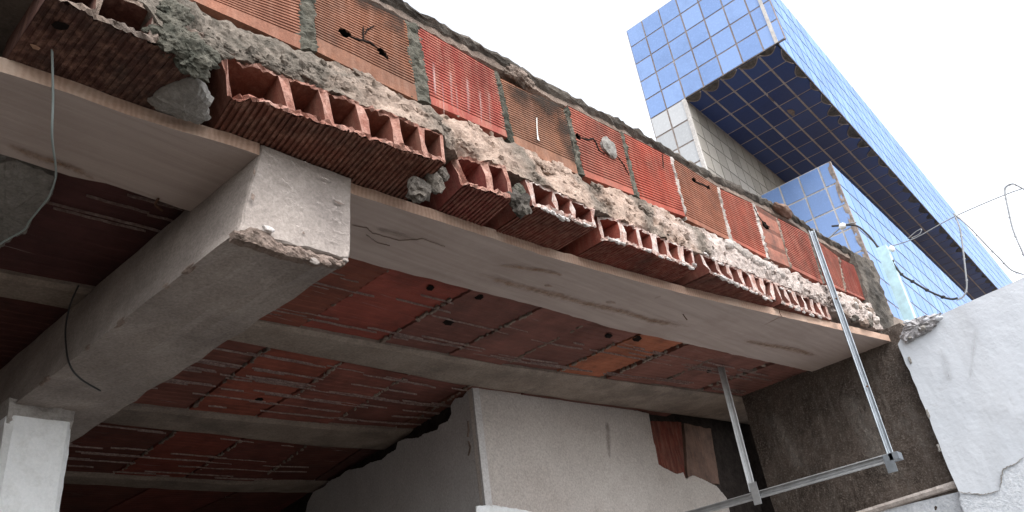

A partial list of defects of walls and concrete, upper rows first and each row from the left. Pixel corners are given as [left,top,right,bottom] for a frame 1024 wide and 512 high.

crack [350,25,378,49]
crack [580,137,629,175]
spalling [686,46,997,292]
spalling [229,225,349,270]
crack [352,224,445,247]
spalling [900,312,943,343]